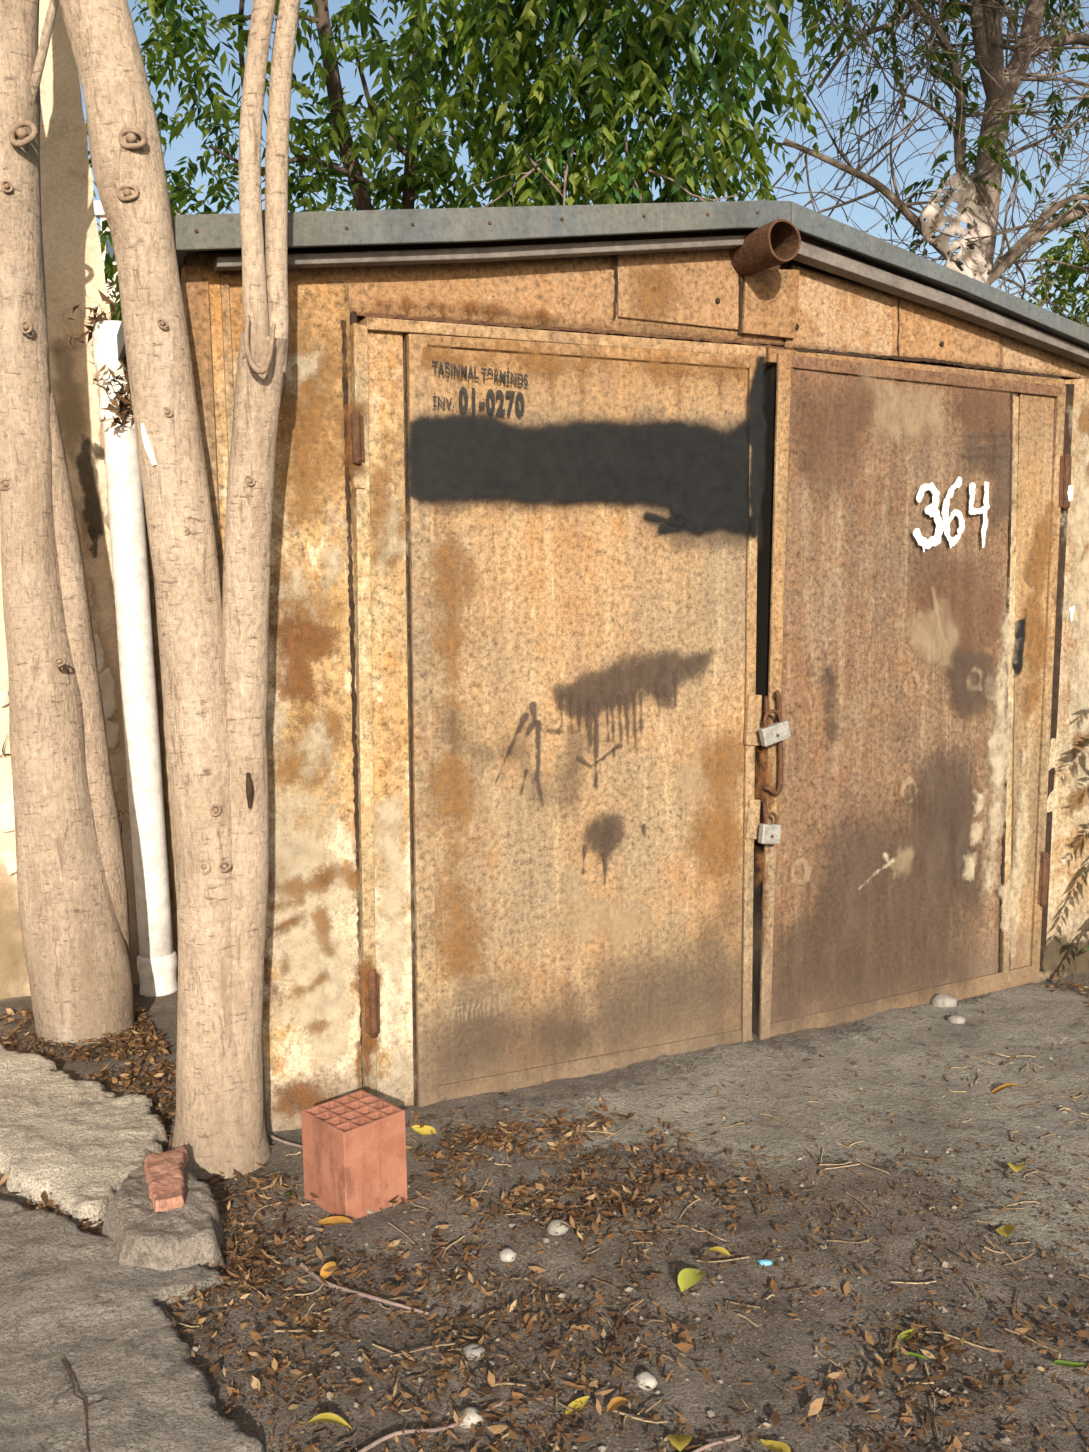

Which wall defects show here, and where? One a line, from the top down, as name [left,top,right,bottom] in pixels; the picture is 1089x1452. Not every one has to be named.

rust [273,323,405,565]
rust [269,569,341,783]
peeling [964,594,1028,951]
rust [276,1083,337,1115]
rust [263,864,360,1006]
rust [355,960,381,1092]